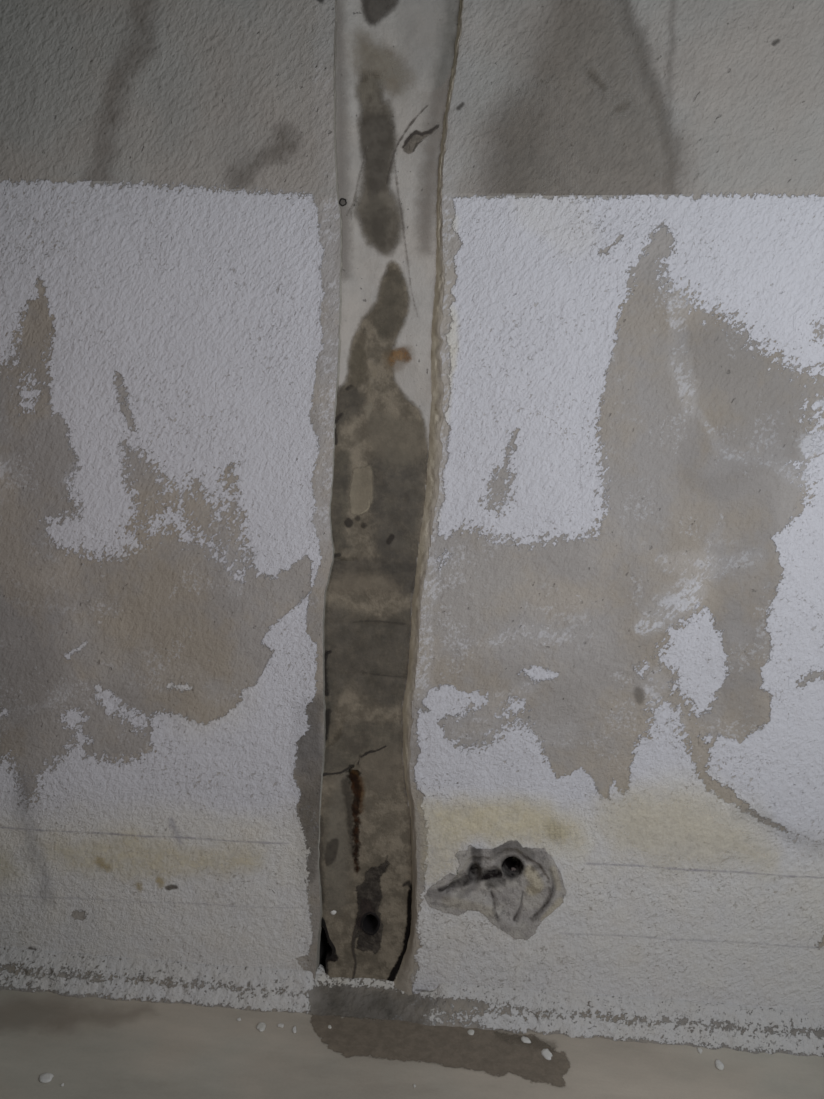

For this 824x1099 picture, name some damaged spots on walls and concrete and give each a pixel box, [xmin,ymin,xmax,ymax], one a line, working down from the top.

damp [363,0,398,24]
peeling [0,268,314,820]
damp [319,43,428,979]
peeling [284,0,824,995]
corrosion [343,772,363,873]
crack [352,924,364,979]
crack [387,881,433,992]